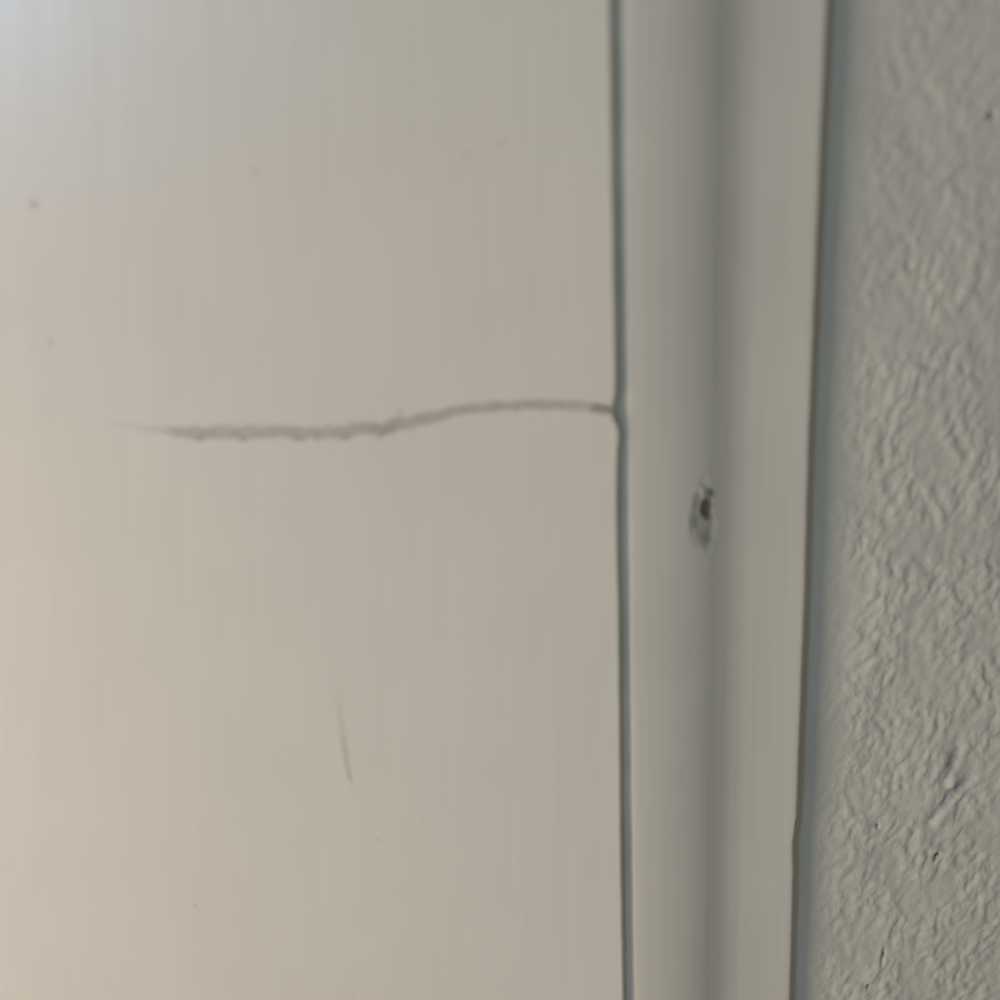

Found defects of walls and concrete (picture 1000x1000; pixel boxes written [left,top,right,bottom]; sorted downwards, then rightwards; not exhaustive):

crack [595,404,609,412]